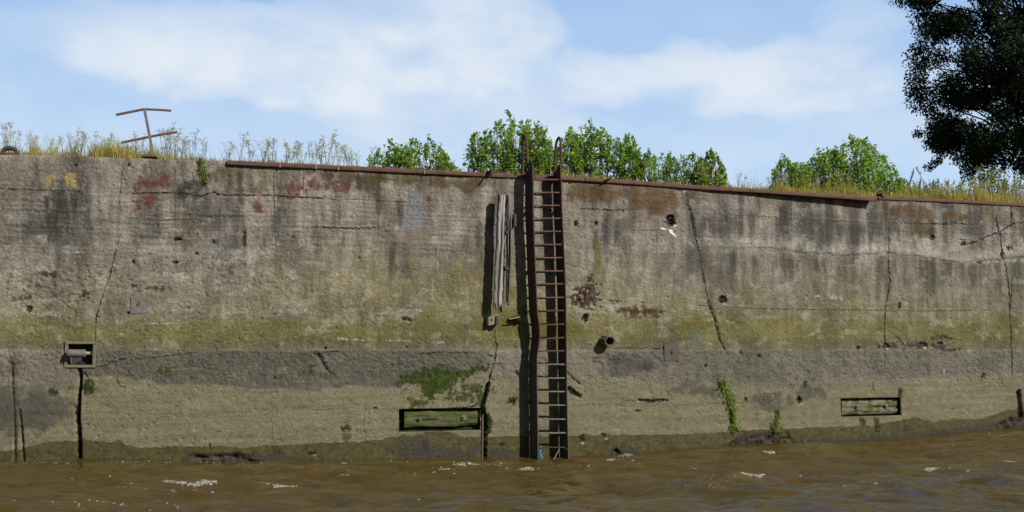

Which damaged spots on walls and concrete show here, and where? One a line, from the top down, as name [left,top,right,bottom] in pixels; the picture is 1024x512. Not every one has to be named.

corrosion [306,169,486,194]
crack [95,164,407,337]
crack [275,350,337,379]
crack [403,330,498,458]
crack [679,188,1024,418]